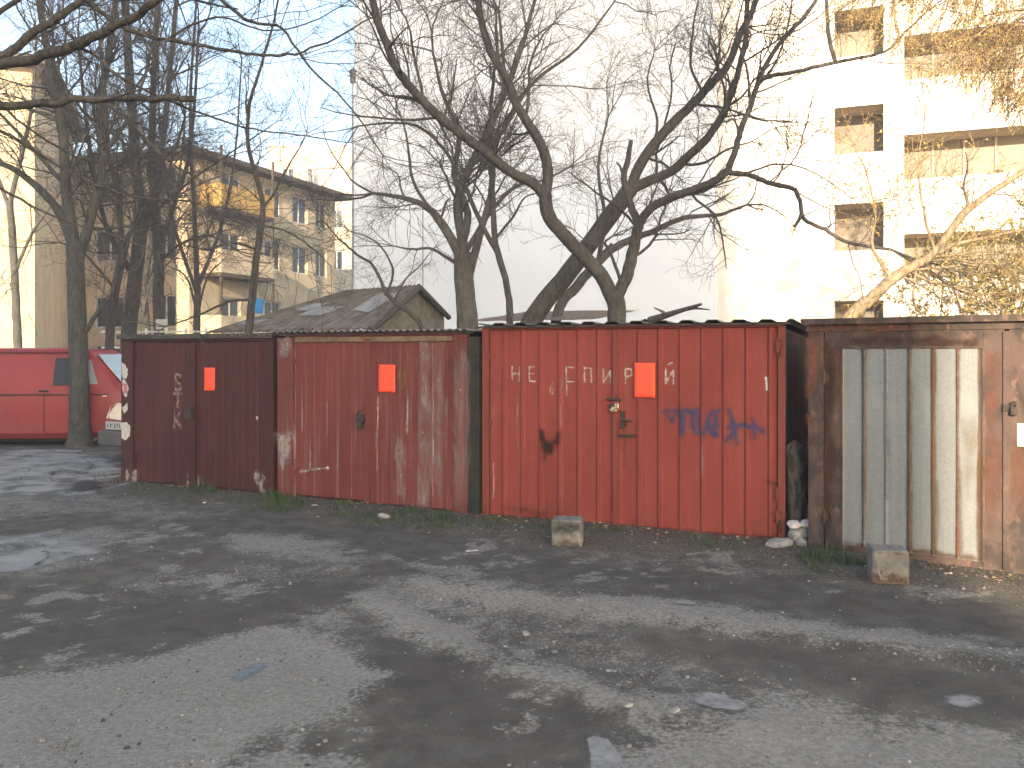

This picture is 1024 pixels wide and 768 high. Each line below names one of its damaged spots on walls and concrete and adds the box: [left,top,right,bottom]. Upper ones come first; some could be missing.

peeling [277,432,291,469]
corrosion [805,323,982,561]
peeling [254,471,266,493]